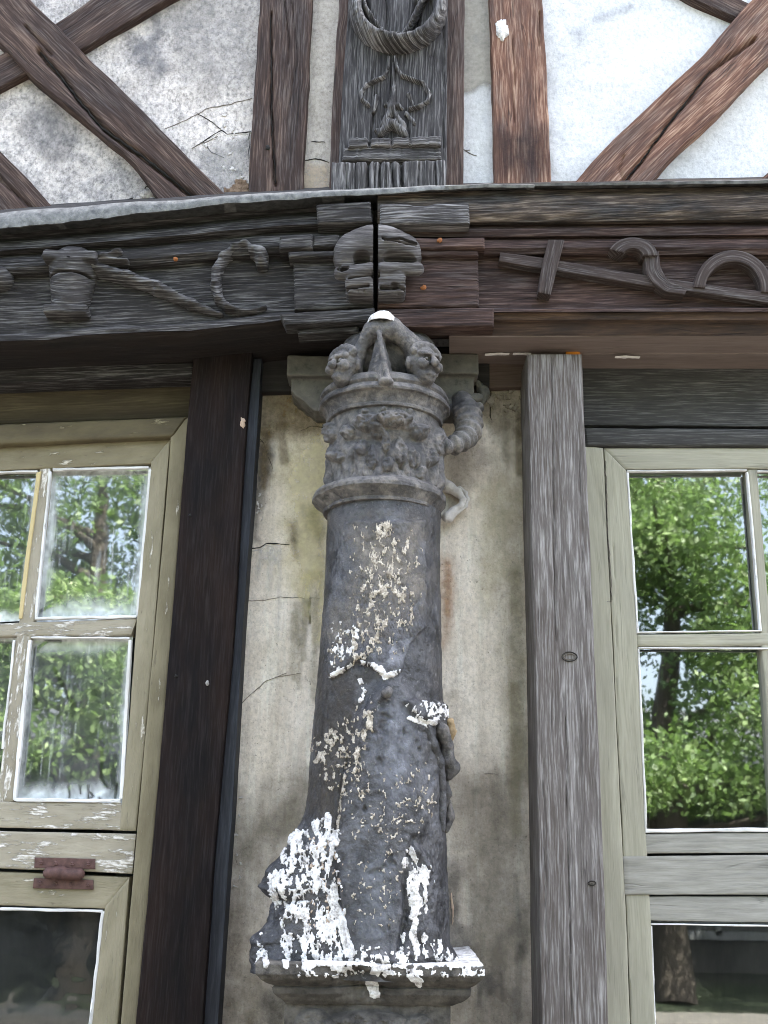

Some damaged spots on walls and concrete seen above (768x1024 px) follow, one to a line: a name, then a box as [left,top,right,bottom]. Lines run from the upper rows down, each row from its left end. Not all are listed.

crack [40,52,192,200]
crack [165,17,276,184]
crack [252,543,290,552]
spalling [255,520,485,999]